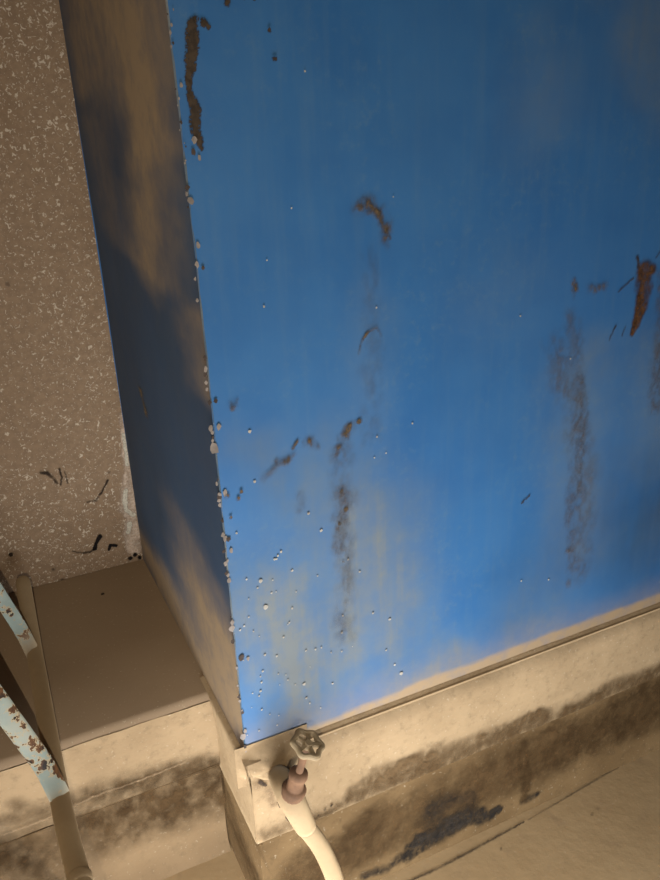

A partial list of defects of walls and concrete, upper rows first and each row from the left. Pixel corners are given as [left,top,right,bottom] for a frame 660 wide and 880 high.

rust [357,201,391,241]
rust [630,262,656,337]
rust [336,419,361,454]
damp [331,666,660,879]
damp [76,760,226,848]
damp [0,834,57,877]
damp [231,823,258,880]
damp [283,850,325,880]